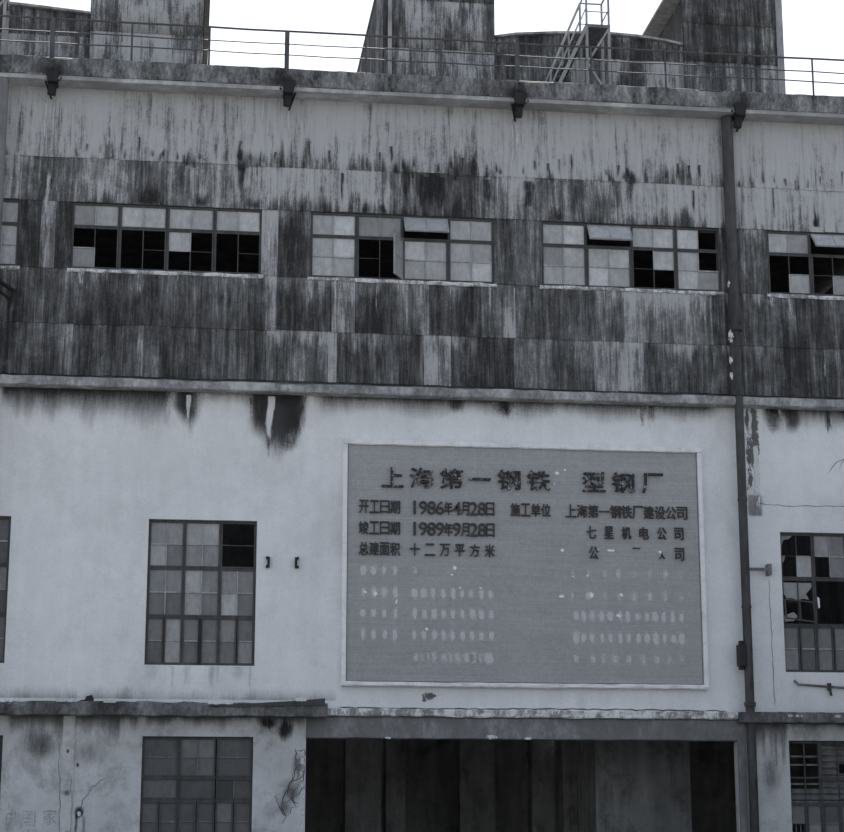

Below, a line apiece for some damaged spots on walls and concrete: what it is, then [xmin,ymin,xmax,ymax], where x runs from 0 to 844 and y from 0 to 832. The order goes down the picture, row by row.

damp [402,172,445,205]
damp [524,181,534,205]
damp [615,181,633,204]
damp [3,387,197,419]
damp [250,394,306,447]
peeling [744,408,761,515]
crack [58,750,109,832]
crack [274,749,306,823]